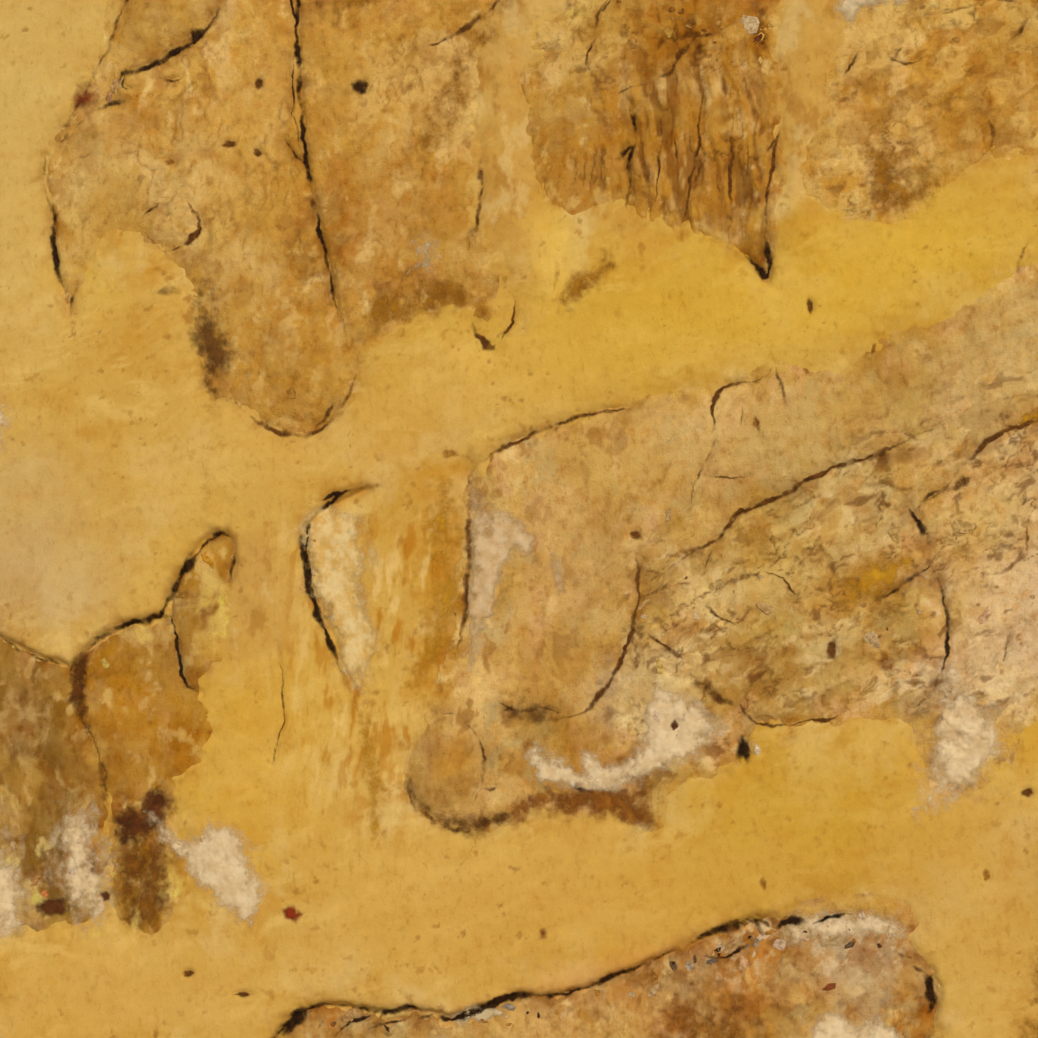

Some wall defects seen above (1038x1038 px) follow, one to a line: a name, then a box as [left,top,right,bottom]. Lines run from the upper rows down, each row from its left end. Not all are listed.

spalling [46,0,508,433]
crack [287,0,336,306]
spalling [519,0,787,283]
spalling [800,0,1038,224]
peeling [298,506,377,688]
spalling [402,262,1038,833]
spalling [0,533,263,935]
leakage [506,707,547,721]
leakage [527,687,724,790]
leakage [0,850,26,937]
leakage [58,809,110,916]
spalling [283,892,940,1038]